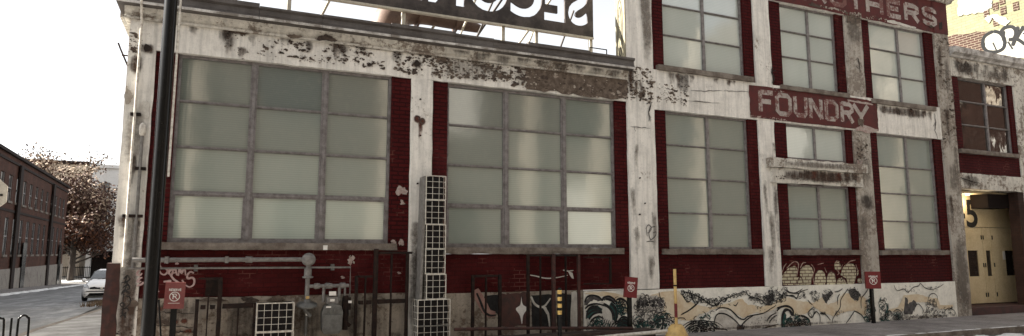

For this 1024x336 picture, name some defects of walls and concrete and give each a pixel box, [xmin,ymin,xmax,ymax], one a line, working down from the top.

peeling [128,32,153,73]
spalling [257,34,679,103]